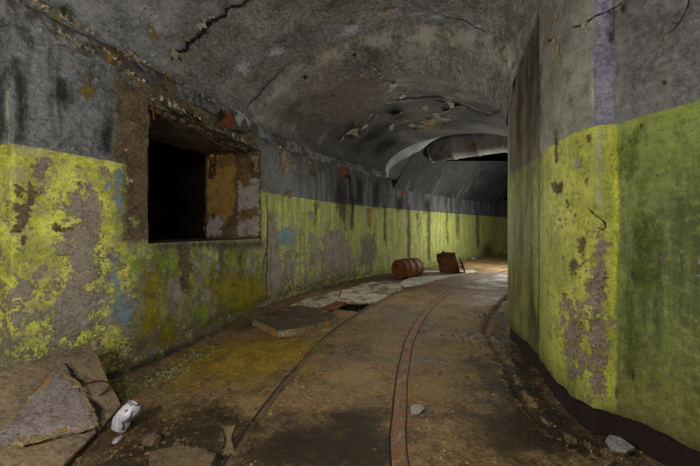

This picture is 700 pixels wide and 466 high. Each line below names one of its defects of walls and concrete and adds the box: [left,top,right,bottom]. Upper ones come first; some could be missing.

crack [170,0,249,61]
crack [572,2,625,33]
corrosion [217,106,246,134]
peeling [340,94,460,142]
peeling [9,0,297,343]
water stain [336,178,386,241]
water stain [396,198,430,260]
water stain [155,242,262,305]
peeling [557,224,615,402]